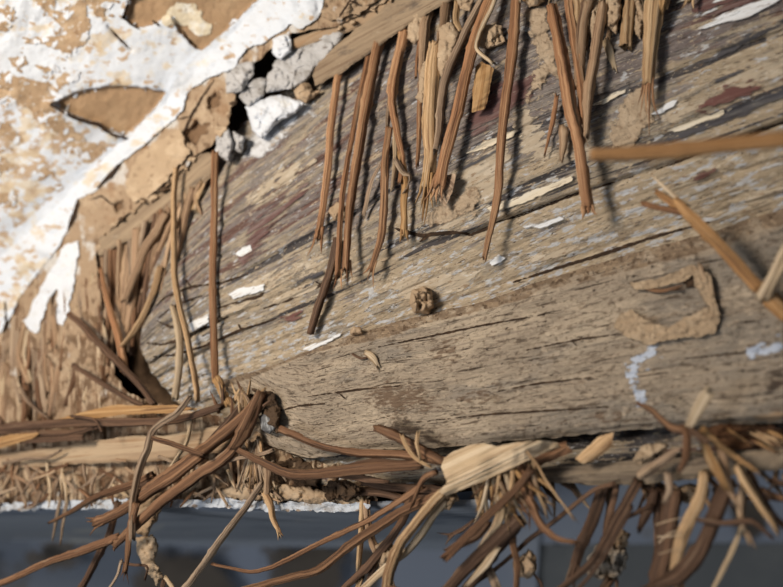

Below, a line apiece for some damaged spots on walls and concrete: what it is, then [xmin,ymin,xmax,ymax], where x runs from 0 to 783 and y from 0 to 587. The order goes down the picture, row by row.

spalling [0,0,257,163]
peeling [0,122,24,176]
peeling [31,160,63,192]
peeling [0,189,18,209]
peeling [23,241,79,333]
peeling [0,498,128,512]
peeling [163,497,370,513]